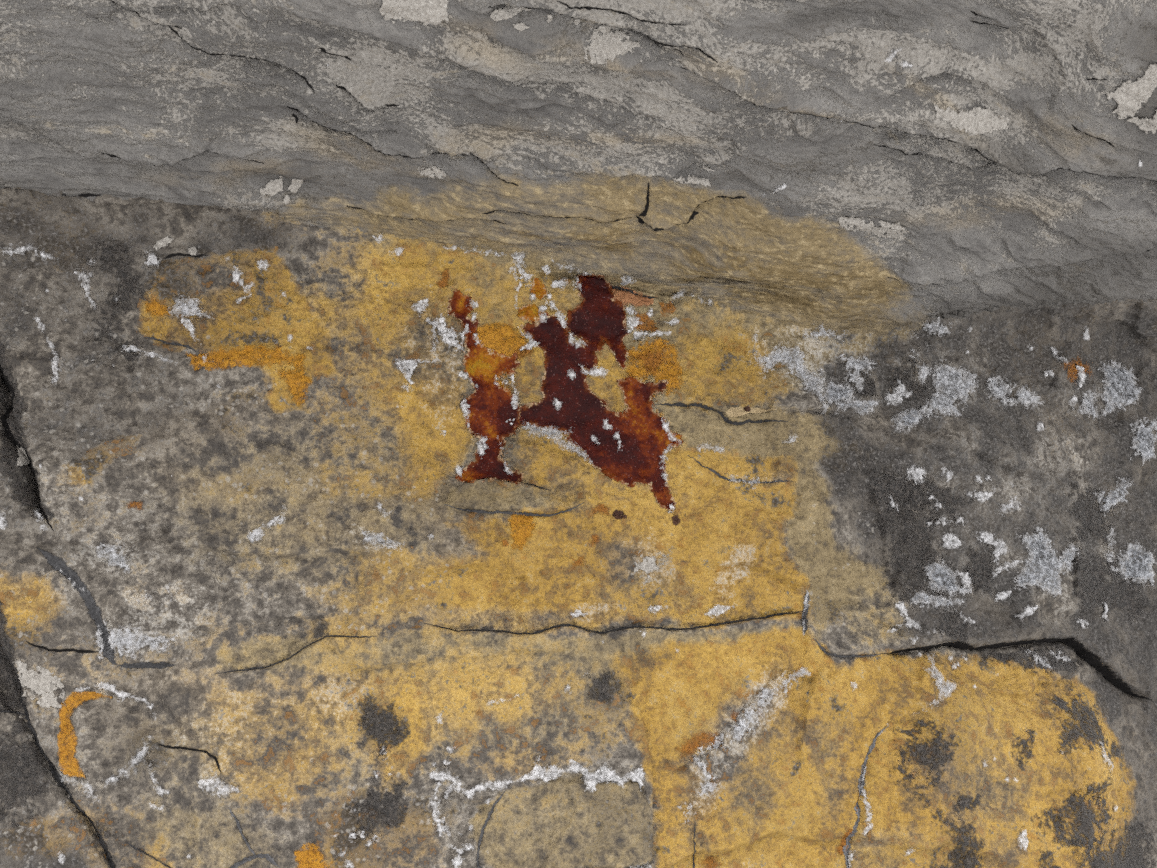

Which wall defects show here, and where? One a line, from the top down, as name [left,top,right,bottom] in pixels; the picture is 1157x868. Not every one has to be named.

crack [110,0,746,231]
corrosion [437,270,684,526]
damp [755,318,1044,431]
damp [1045,347,1143,418]
damp [1130,417,1157,462]
crack [0,366,176,868]
crack [424,591,1153,702]
damp [859,456,1155,705]